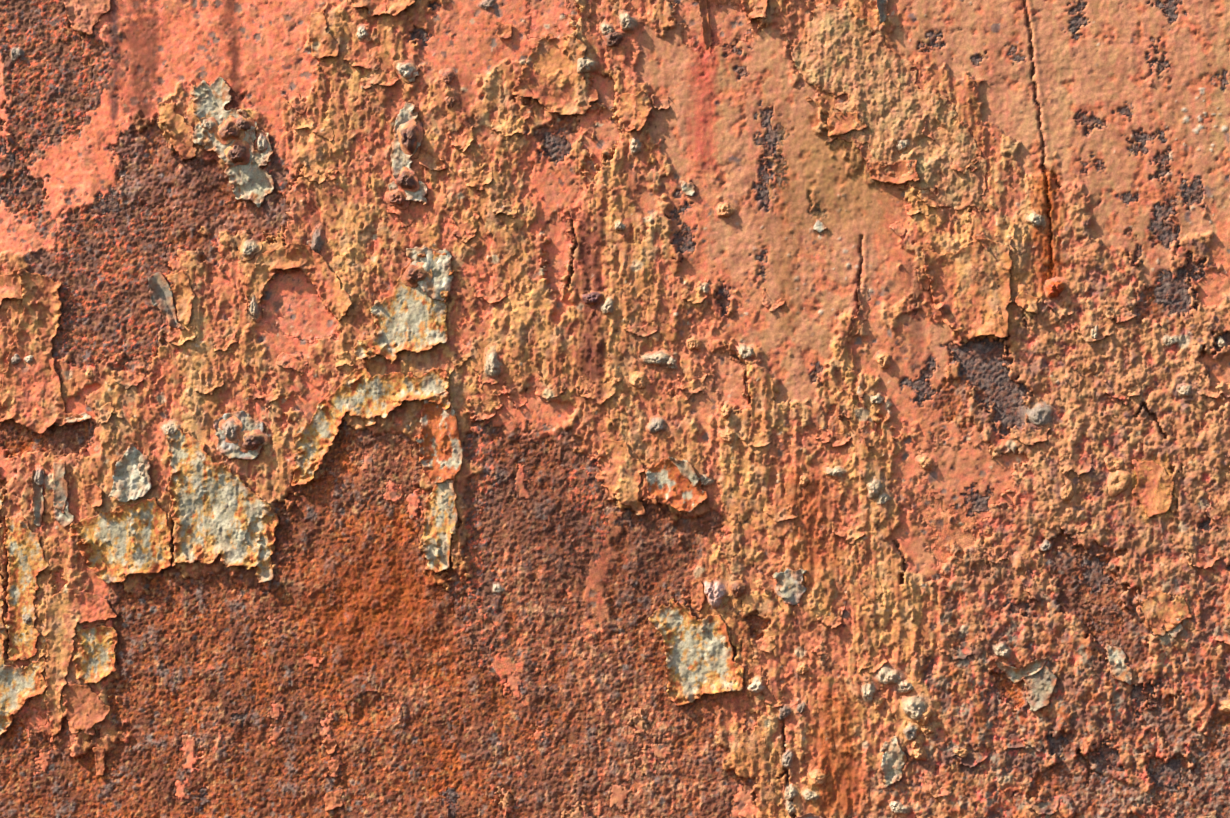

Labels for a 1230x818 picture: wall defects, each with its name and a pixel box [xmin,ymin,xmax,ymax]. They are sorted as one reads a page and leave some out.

spalling [0,0,111,210]
corrosion [110,0,158,123]
peeling [351,0,436,17]
peeling [513,0,670,184]
spalling [669,0,768,79]
peeling [783,0,989,237]
crack [1024,0,1059,268]
spalling [0,76,822,818]
peeling [916,223,1141,581]
peeling [994,657,1057,711]
spalling [1060,520,1192,717]
spalling [1149,717,1230,818]